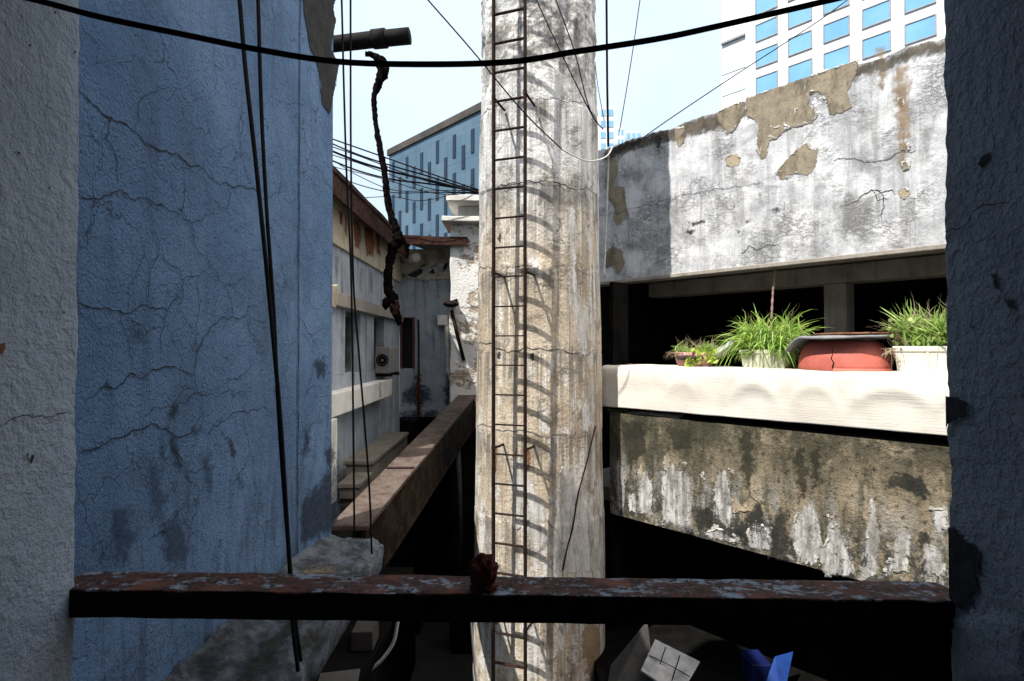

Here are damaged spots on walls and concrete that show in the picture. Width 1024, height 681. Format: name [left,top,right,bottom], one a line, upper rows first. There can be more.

flaking render [304,0,339,114]
peeling [604,153,628,225]
crack [478,175,775,216]
water stain [603,113,723,160]
peeling [717,59,859,159]
peeling [775,142,818,179]
crack [840,189,896,223]
crack [833,149,917,163]
water stain [855,39,946,163]
crack [3,28,327,538]
water stain [888,472,930,500]
water stain [694,503,792,562]